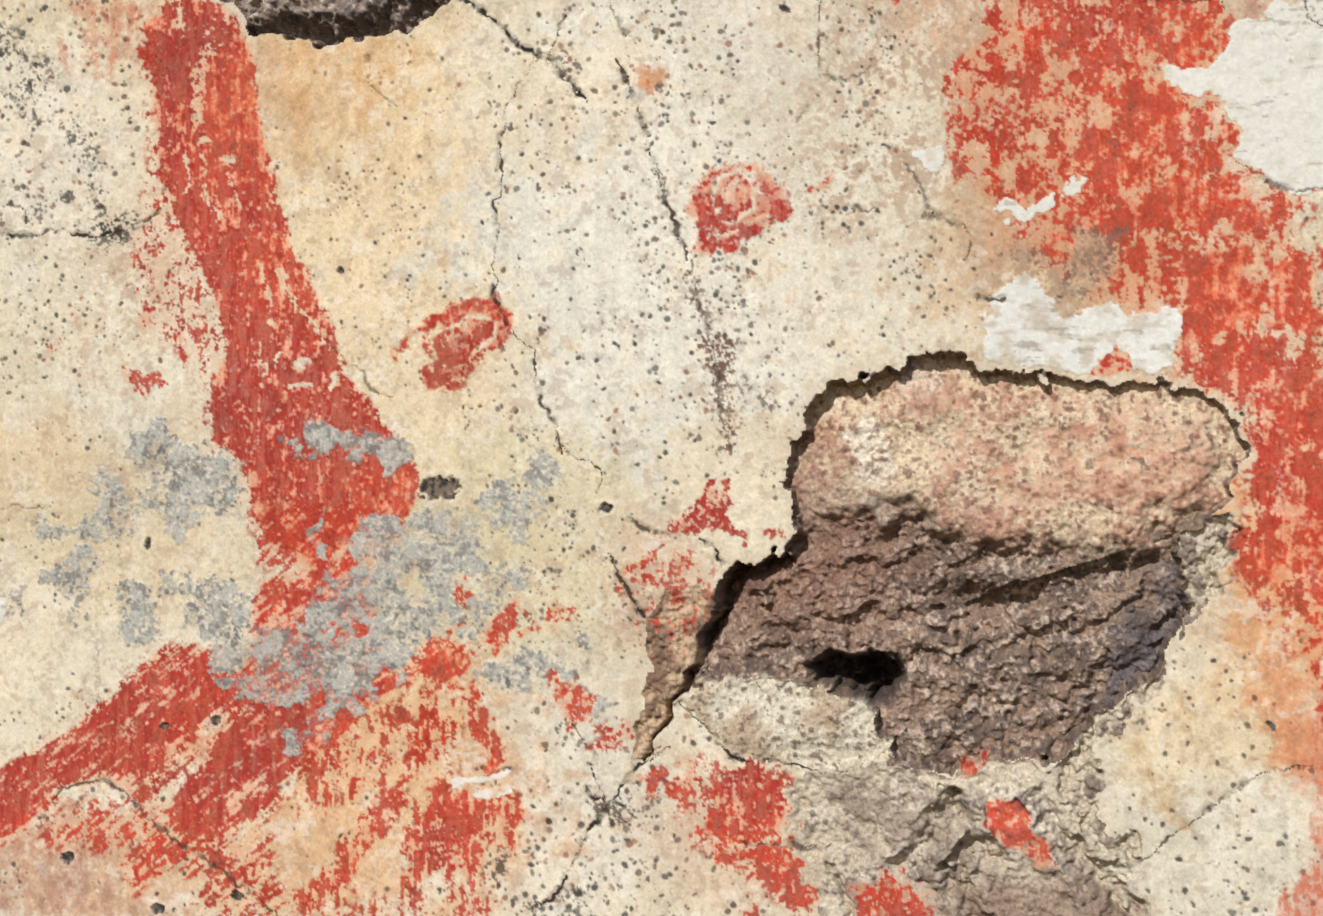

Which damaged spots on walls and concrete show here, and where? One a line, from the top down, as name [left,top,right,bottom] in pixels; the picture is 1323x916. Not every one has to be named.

spalling [219,0,451,49]
peeling [1160,0,1323,197]
crack [0,207,162,240]
crack [457,0,603,494]
crack [609,0,732,454]
spalling [0,270,1251,916]
crack [607,549,647,618]
crack [627,517,726,566]
crack [531,723,671,910]